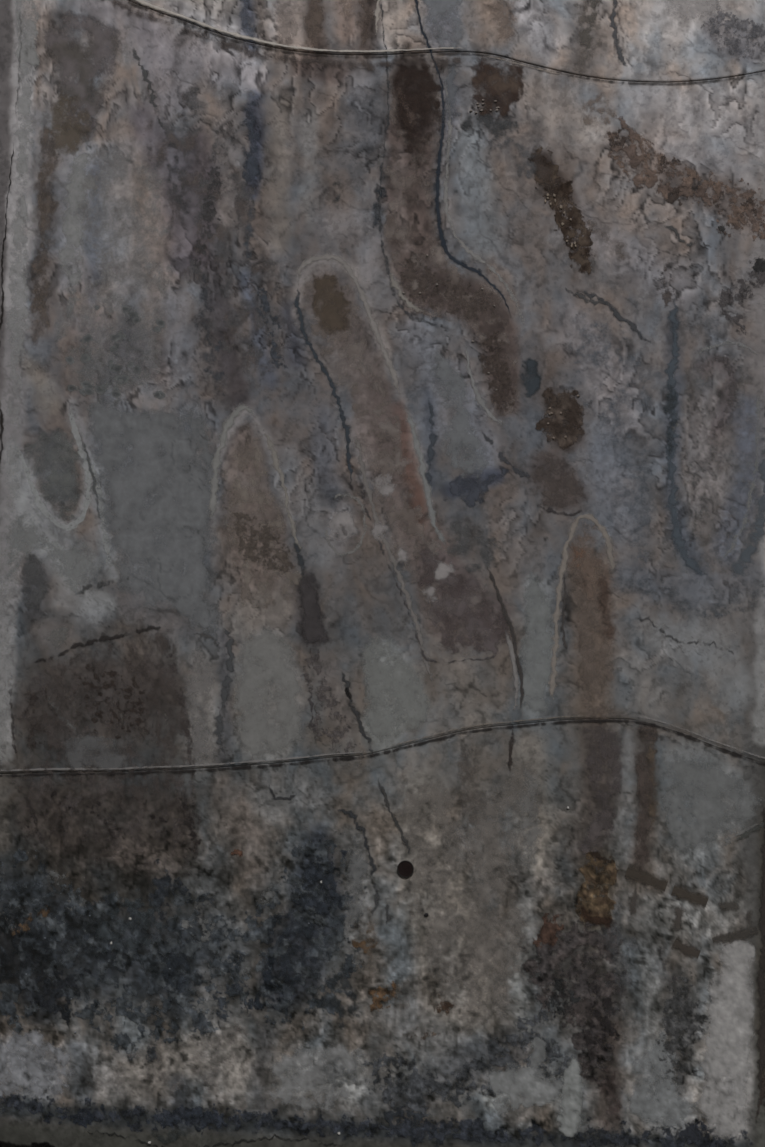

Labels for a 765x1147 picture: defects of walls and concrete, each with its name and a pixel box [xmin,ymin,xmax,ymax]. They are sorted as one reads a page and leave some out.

crack [113,0,745,85]
crack [0,150,14,328]
rust [607,115,765,241]
crack [0,409,8,460]
water stain [0,400,758,1147]
crack [0,571,765,853]
crack [371,885,392,922]
rust [533,913,564,950]
rust [574,852,619,927]
rust [757,809,765,1116]